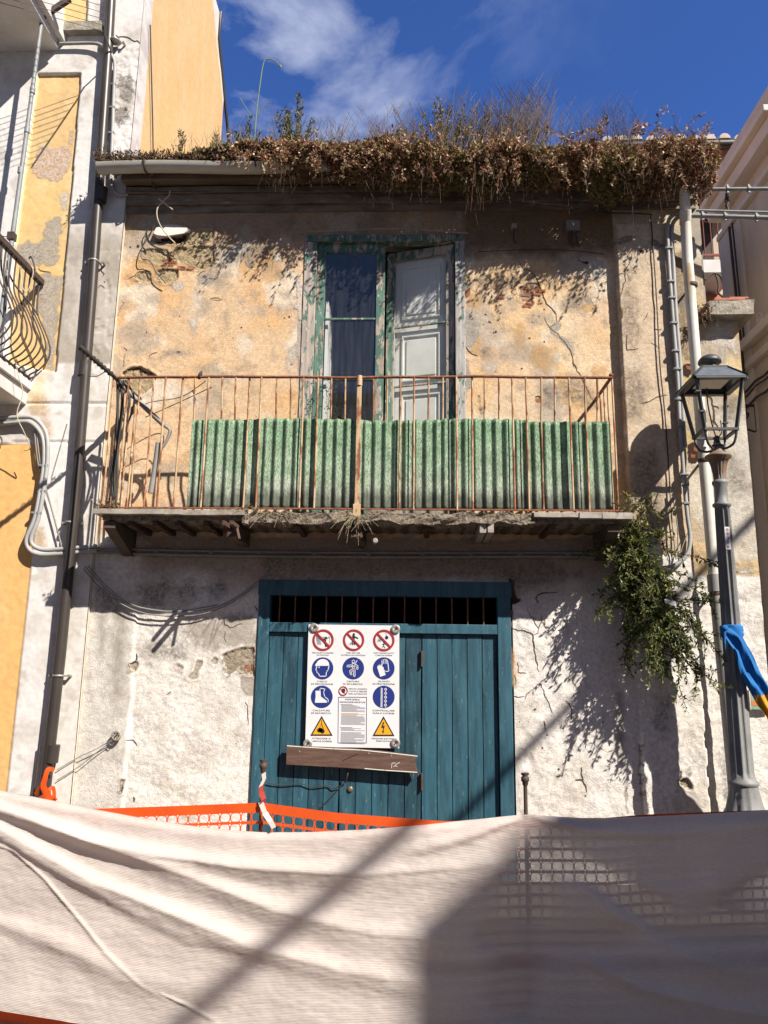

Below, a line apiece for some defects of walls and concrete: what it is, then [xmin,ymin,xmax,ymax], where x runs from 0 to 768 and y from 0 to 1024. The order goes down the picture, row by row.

peeling [15,130,74,371]
spalling [130,224,255,284]
spalling [465,277,546,323]
crack [518,261,591,396]
spalling [124,366,157,394]
peeling [189,615,257,695]
crack [512,592,572,730]